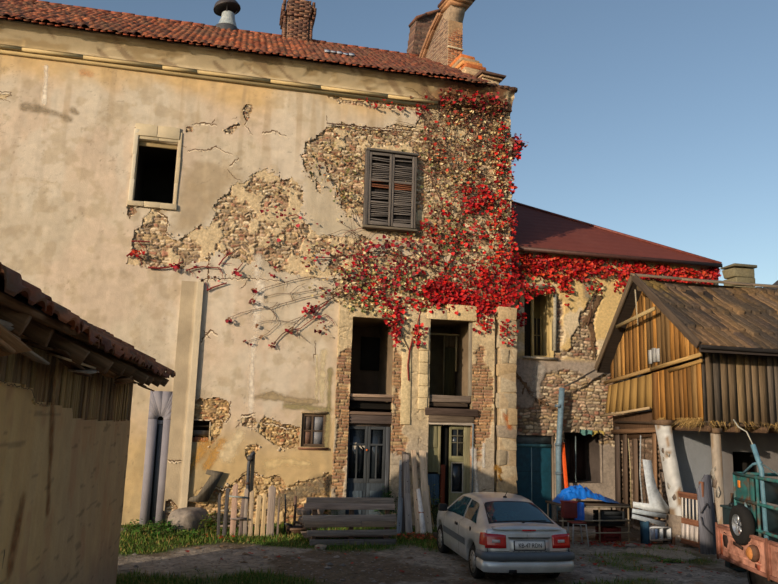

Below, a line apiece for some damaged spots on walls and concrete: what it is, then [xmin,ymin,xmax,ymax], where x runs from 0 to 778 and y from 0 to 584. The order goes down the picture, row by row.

crack [236,117,287,138]
crack [188,146,240,180]
flaking render [122,96,511,337]
flaking render [194,397,300,459]
flaking render [165,472,330,525]